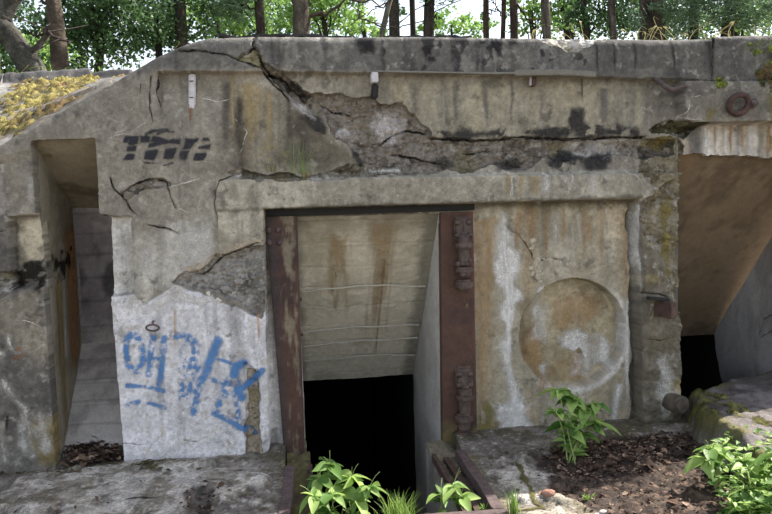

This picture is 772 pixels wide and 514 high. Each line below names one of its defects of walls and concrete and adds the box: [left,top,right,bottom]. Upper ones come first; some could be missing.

water stain [357,38,374,53]
water stain [491,39,517,56]
water stain [441,129,504,143]
water stain [526,89,639,192]
crack [110,161,243,221]
spalling [227,50,709,318]
spalling [0,271,20,299]
spalling [138,237,267,319]
water stain [494,216,531,428]
water stain [1,379,51,457]